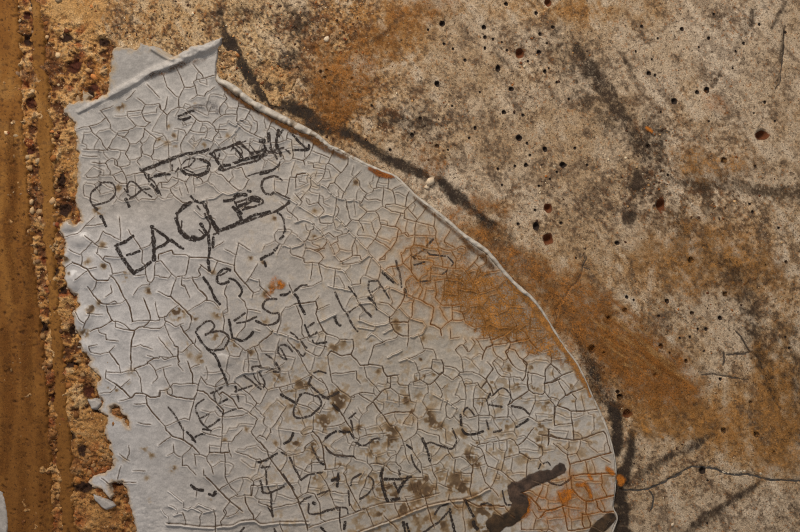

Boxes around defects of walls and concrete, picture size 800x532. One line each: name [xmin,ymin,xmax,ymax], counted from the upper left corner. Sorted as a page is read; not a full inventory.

damp [218,7,510,249]
peeling [4,0,618,532]
crack [65,65,616,532]
damp [414,197,494,269]
rust [558,474,593,505]
rust [408,223,800,469]
rust [606,467,625,486]
damp [572,333,713,532]
crack [623,466,800,511]
damp [686,483,758,532]